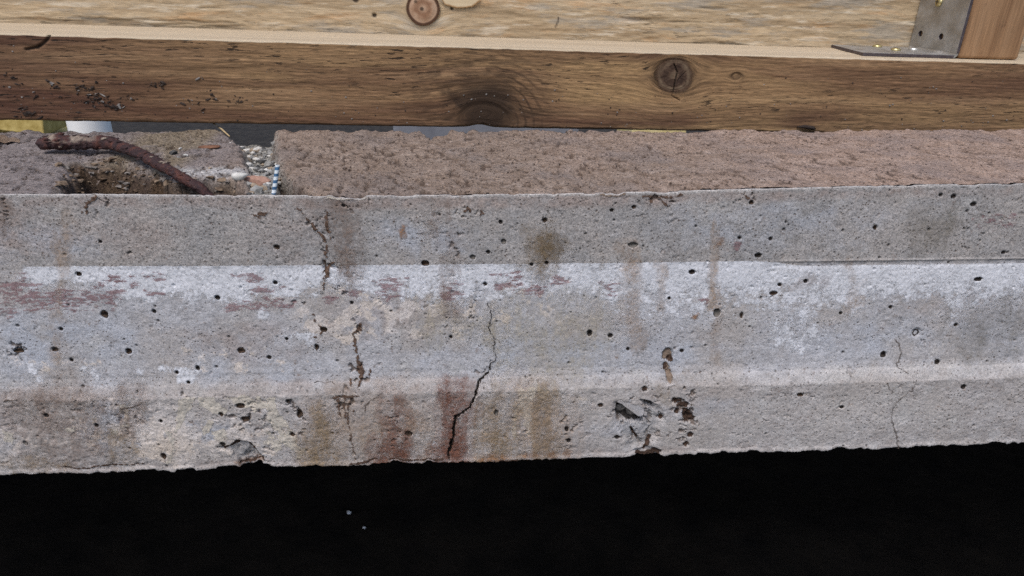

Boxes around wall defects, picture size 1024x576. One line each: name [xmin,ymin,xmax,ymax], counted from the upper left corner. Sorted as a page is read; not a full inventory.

crack [296,208,335,338]
crack [314,322,384,460]
crack [447,302,497,460]
spalling [615,386,695,454]